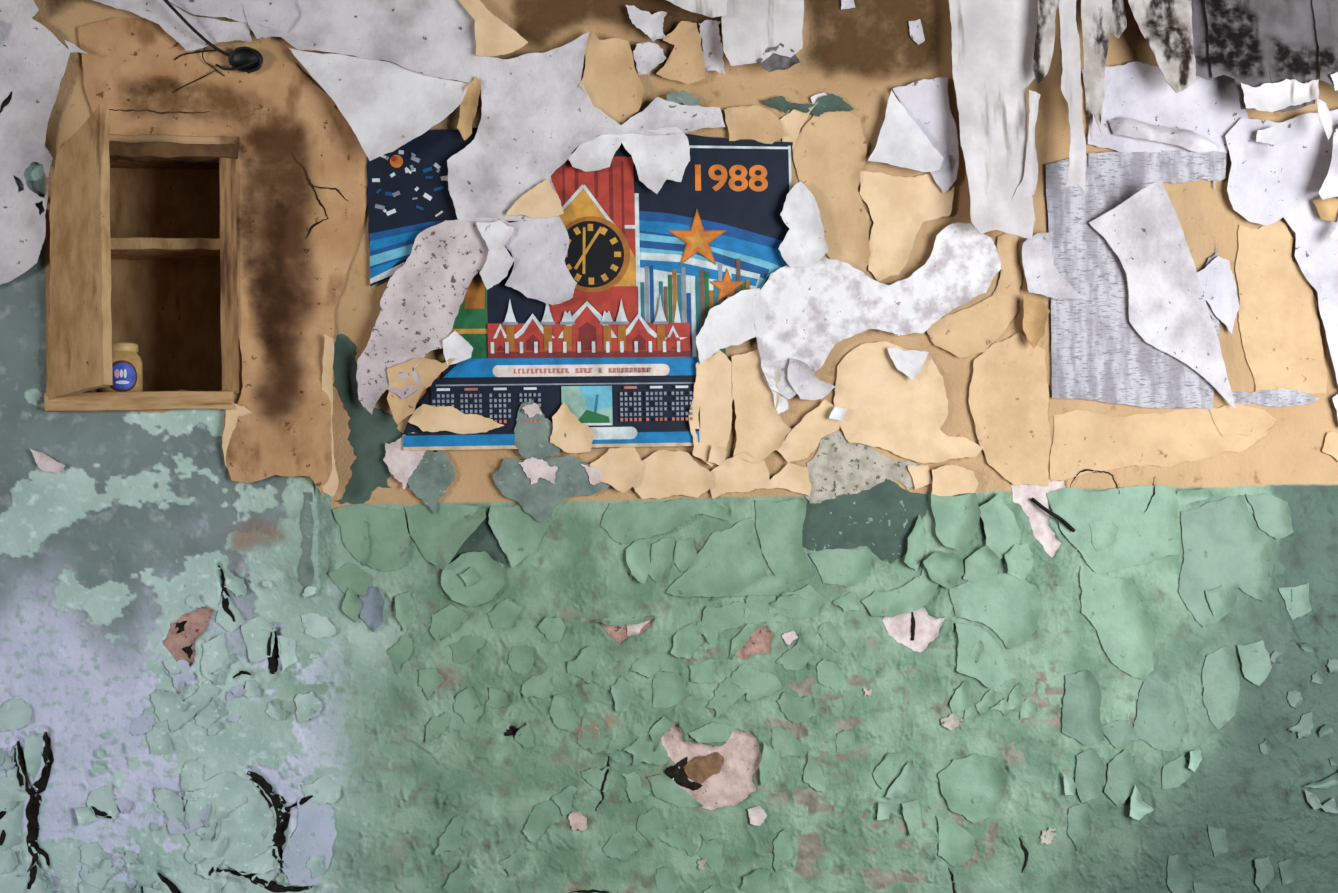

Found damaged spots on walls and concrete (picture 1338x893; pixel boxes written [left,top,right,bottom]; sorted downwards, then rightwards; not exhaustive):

water stain [129,80,312,418]
peeling [724,102,954,281]
peeling [383,404,504,490]
crack [218,565,235,622]
crack [233,628,281,678]
peeling [328,502,551,674]
peeling [425,220,1328,893]
crack [0,732,54,889]
peeling [0,699,59,893]
crack [157,872,181,893]
peeling [150,756,285,893]
crack [209,771,313,893]